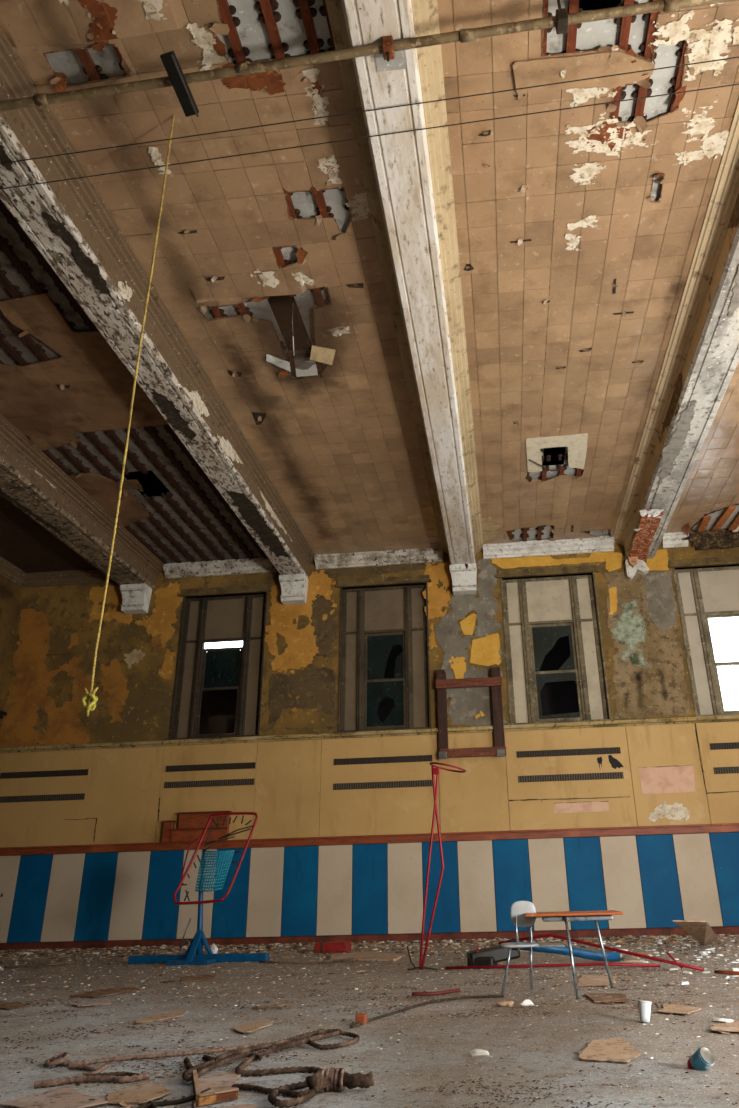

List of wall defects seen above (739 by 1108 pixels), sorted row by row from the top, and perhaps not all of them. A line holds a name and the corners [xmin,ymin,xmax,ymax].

peeling [648,2,739,81]
peeling [0,145,13,171]
peeling [331,326,350,337]
peeling [217,433,243,464]
peeling [226,491,292,558]
peeling [265,509,692,731]
peeling [0,581,183,748]